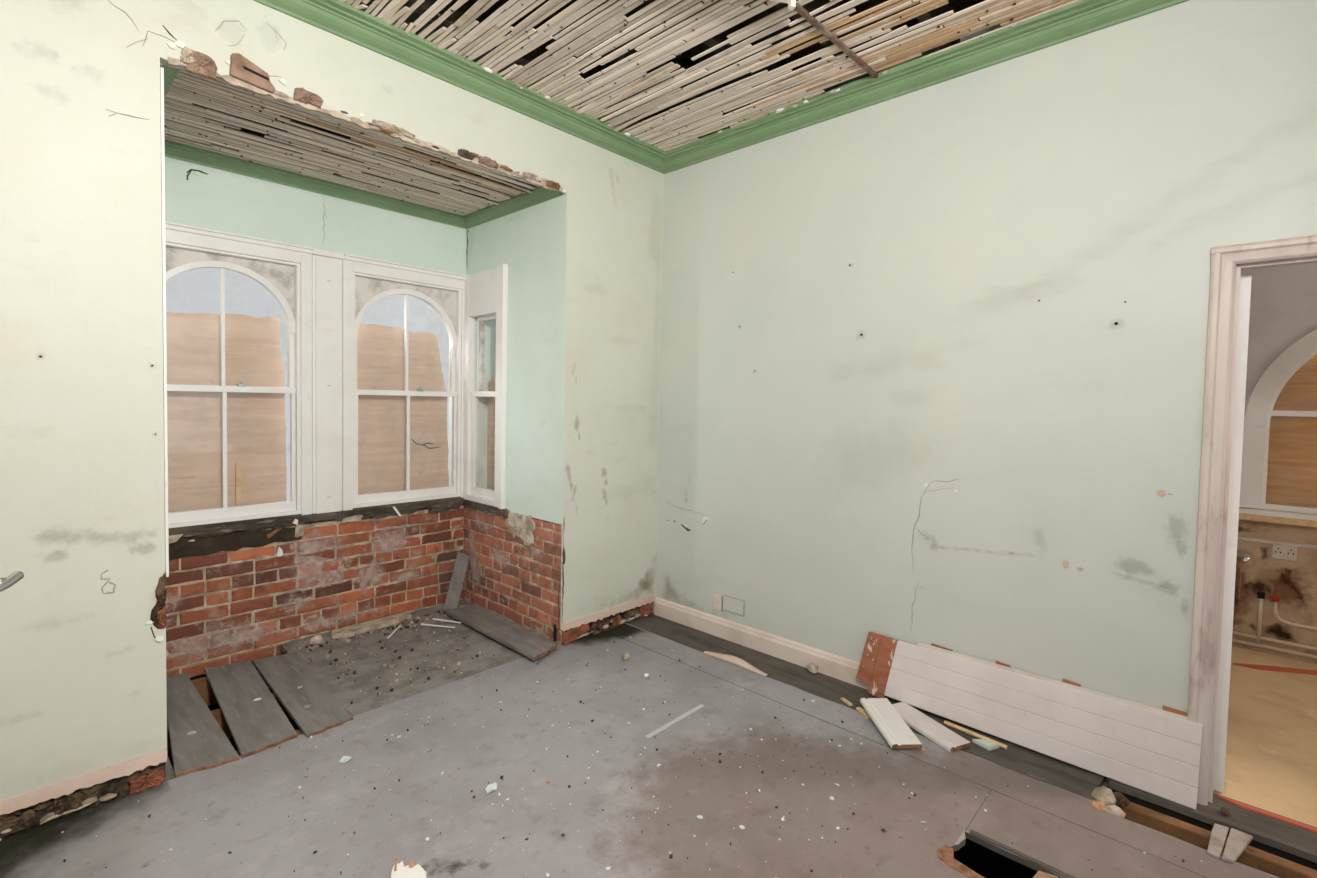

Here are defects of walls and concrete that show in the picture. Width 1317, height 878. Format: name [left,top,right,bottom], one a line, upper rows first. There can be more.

crack [108,0,174,47]
crack [215,20,287,50]
spalling [162,25,566,194]
spalling [553,516,655,645]
crack [910,479,958,630]
water stain [1233,556,1303,640]
spalling [0,748,167,841]